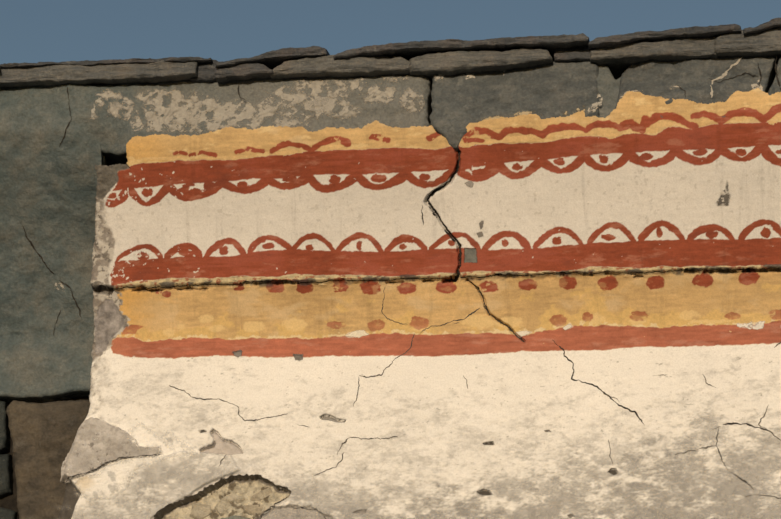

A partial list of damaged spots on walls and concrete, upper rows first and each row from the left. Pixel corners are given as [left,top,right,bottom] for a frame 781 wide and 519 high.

peeling [91,74,425,133]
crack [709,55,781,98]
crack [23,227,82,336]
crack [353,150,524,406]
peeling [737,321,765,330]
crack [169,385,308,427]
crack [553,340,645,426]
flaking render [60,417,243,499]
flaking render [154,474,291,519]
crack [674,406,781,499]